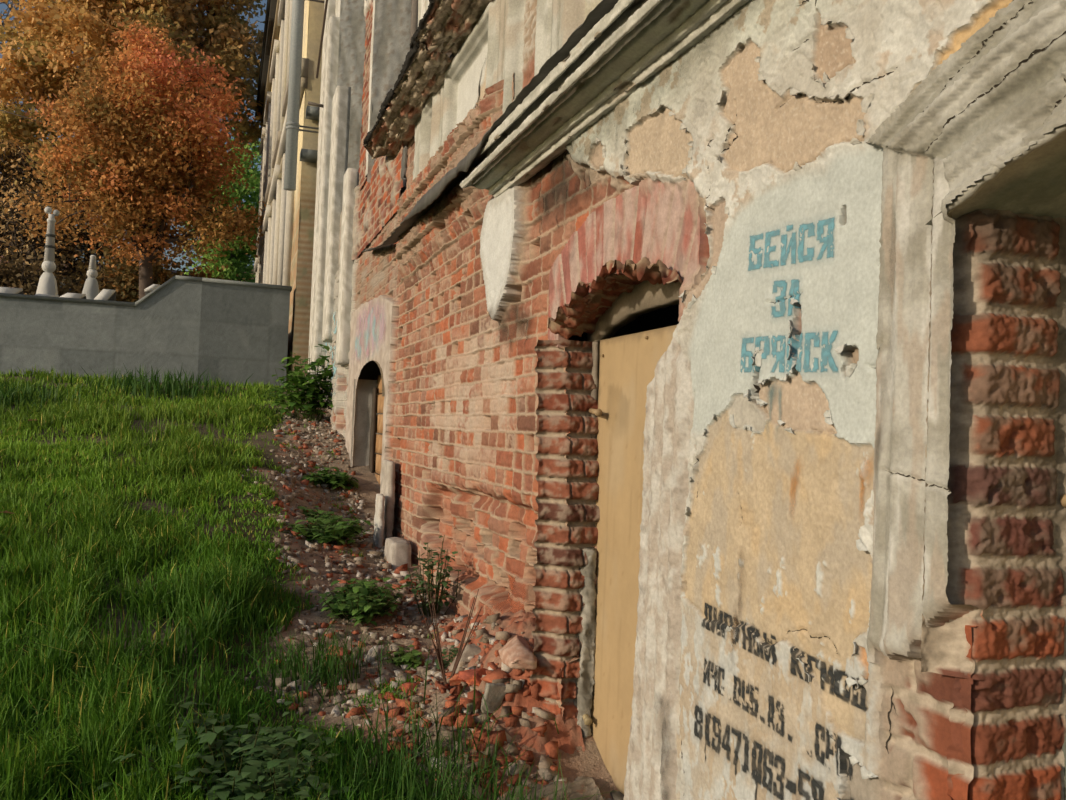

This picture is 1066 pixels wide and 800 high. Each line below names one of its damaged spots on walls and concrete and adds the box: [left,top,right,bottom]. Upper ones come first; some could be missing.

peeling [715,8,874,173]
crack [923,0,1066,152]
flaking render [839,204,847,225]
flaking render [392,78,693,617]
peeling [680,298,985,800]
flaking render [556,655,580,723]